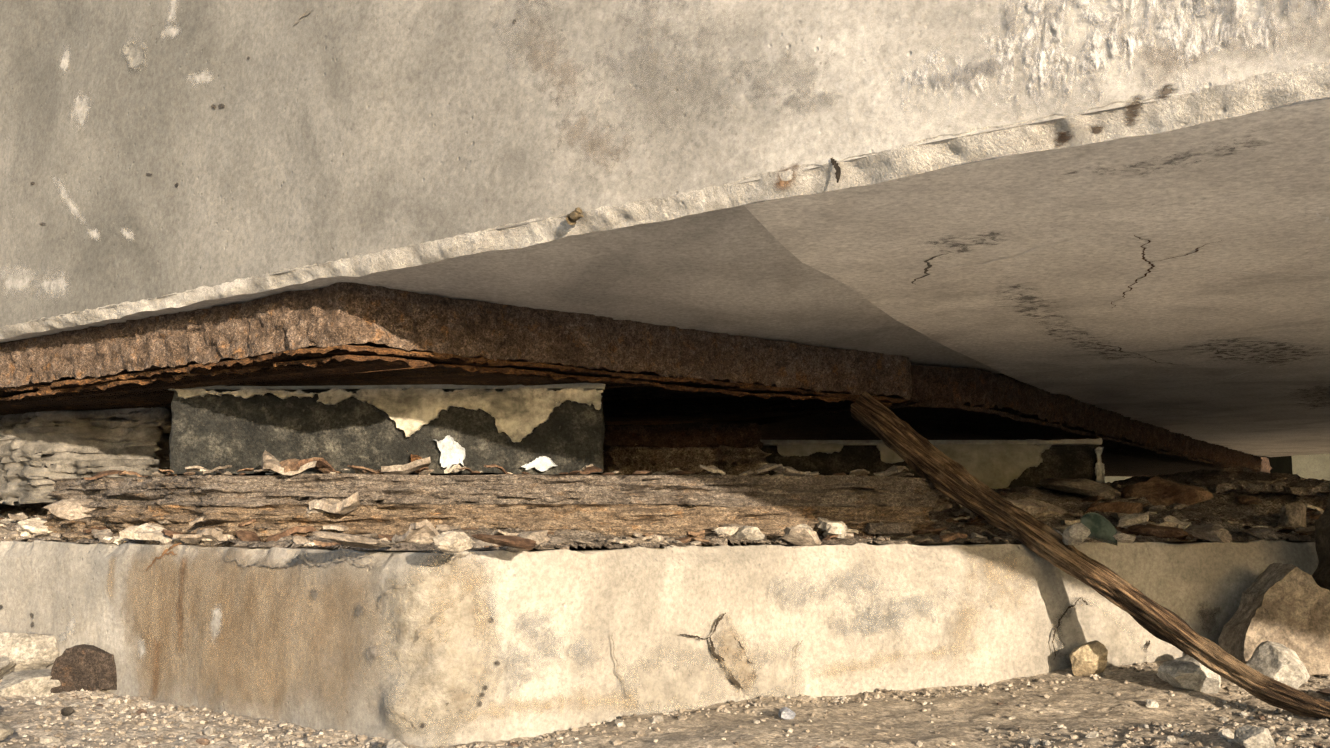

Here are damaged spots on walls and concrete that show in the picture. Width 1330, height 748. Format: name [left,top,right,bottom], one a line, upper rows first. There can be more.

crack [1111,235,1219,308]
peeling [185,465,232,475]
rust [0,345,1257,551]
crack [680,612,803,689]